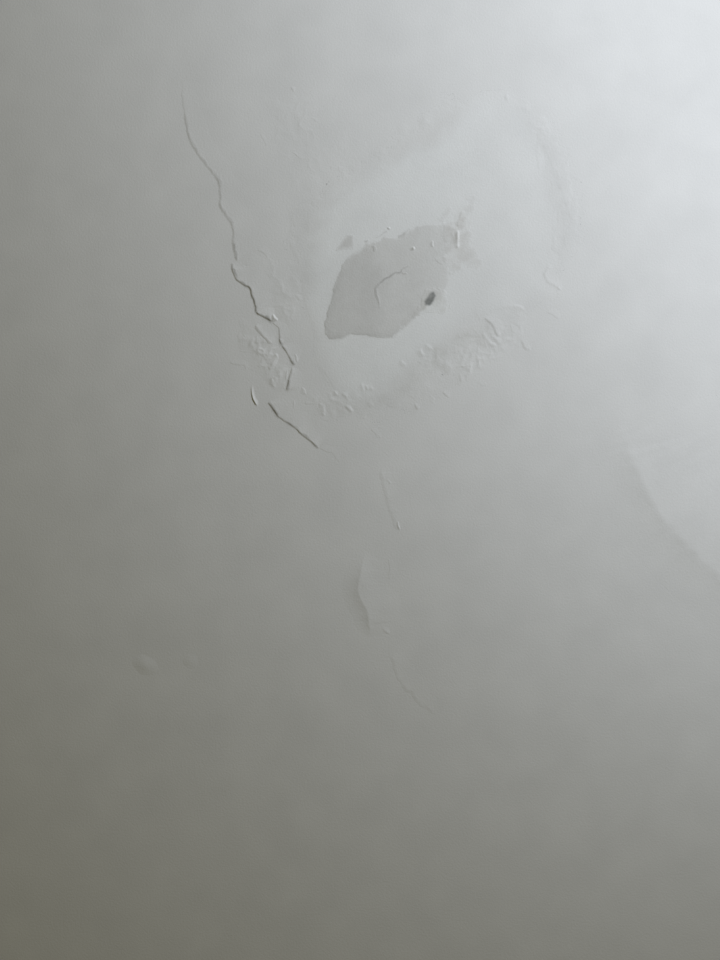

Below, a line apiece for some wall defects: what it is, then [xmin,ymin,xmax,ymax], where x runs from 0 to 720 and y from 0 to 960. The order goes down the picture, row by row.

spalling [324,195,483,340]
crack [267,395,341,462]